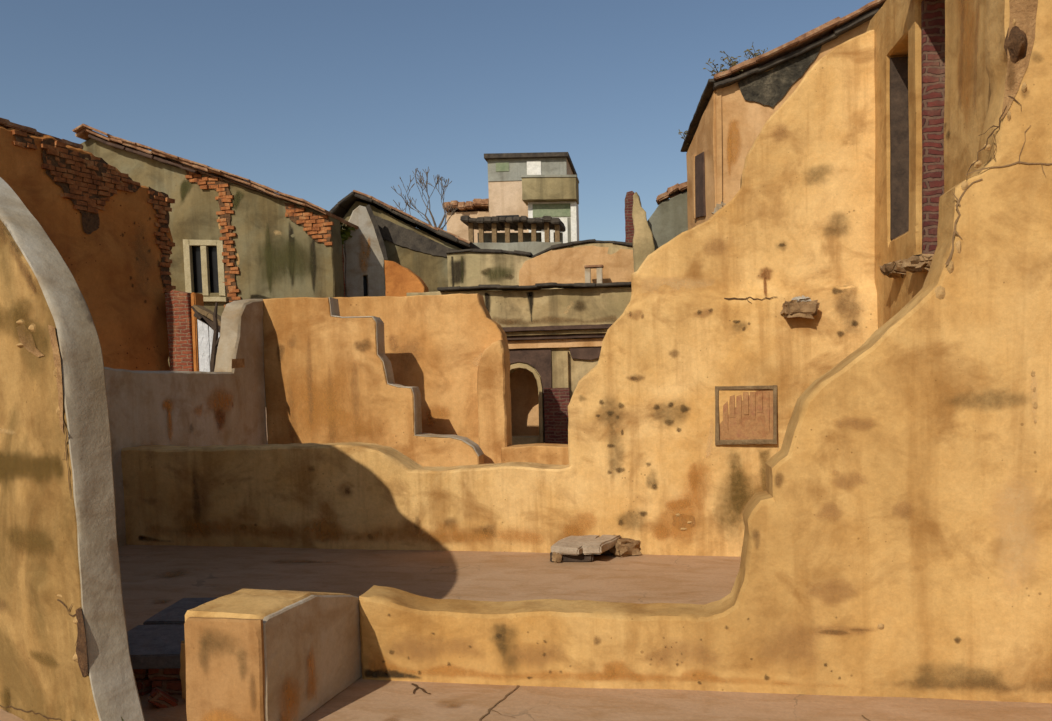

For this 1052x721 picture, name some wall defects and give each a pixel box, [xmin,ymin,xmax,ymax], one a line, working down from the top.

flaking render [12,130,176,293]
flaking render [185,170,242,308]
flaking render [285,203,334,246]
crack [724,296,773,304]
crack [935,72,1052,300]
crack [479,685,519,721]